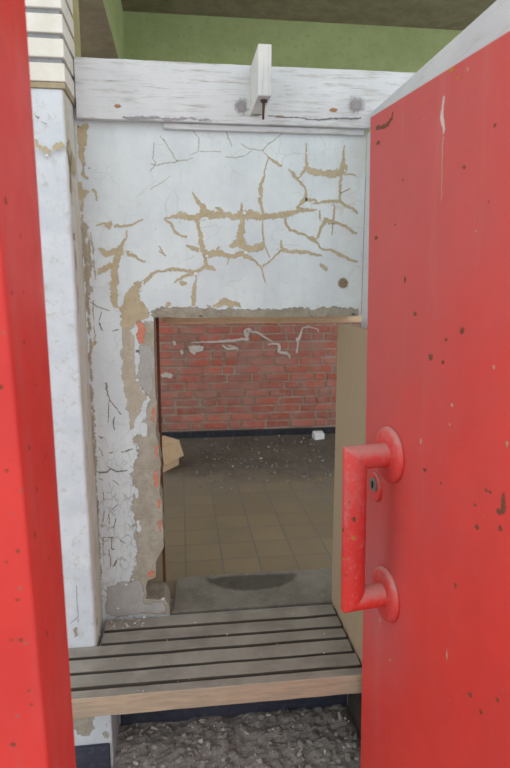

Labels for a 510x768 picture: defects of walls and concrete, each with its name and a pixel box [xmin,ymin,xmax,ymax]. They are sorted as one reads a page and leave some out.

peeling [35,123,143,576]
crack [96,383,133,566]
spalling [115,279,358,616]
damp [173,326,319,359]